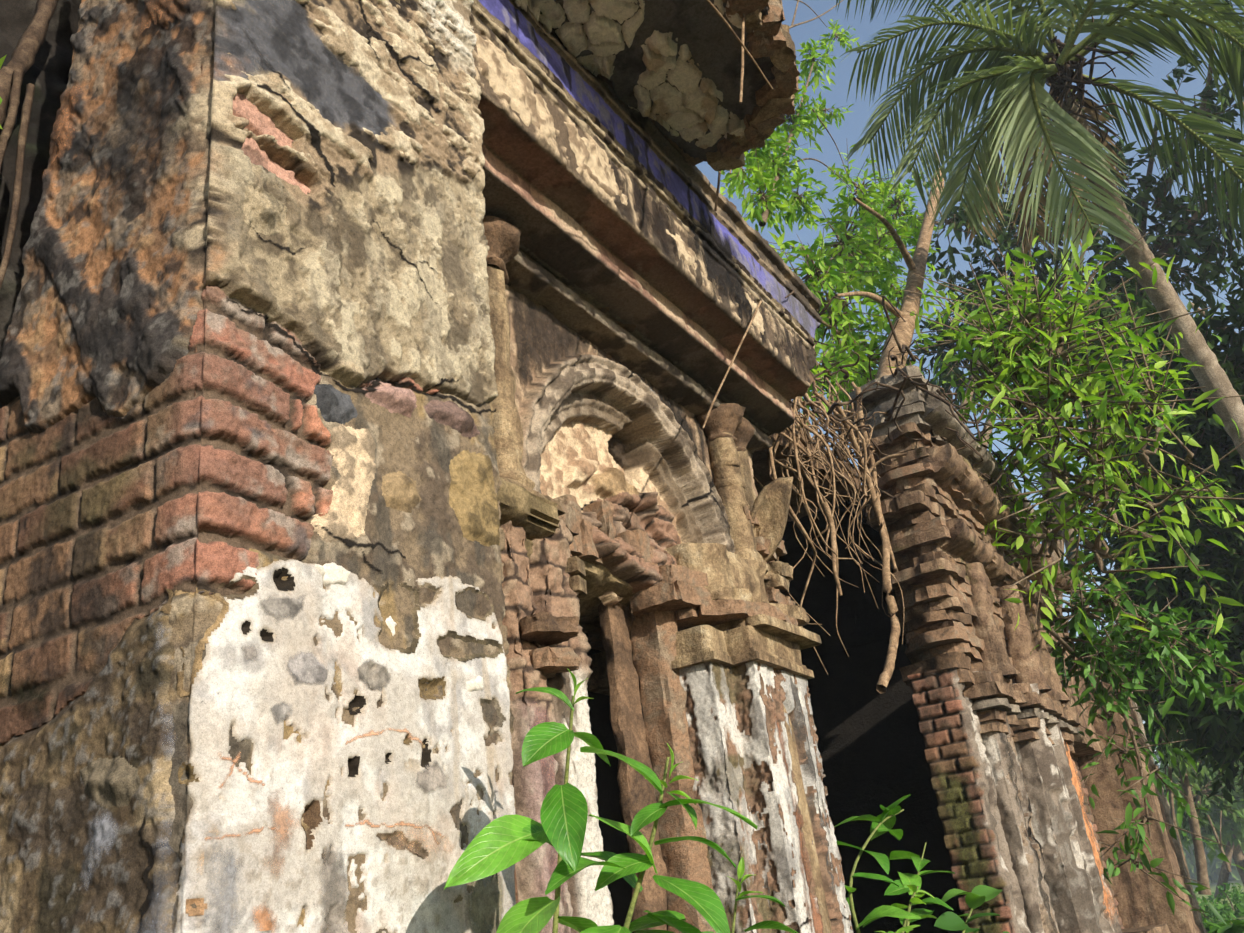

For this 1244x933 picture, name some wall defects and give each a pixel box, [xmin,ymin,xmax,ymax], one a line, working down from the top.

flaking render [219,0,628,205]
flaking render [515,0,746,149]
crack [228,299,496,414]
flaking render [0,285,516,933]
crack [316,525,406,572]
spalling [725,663,853,933]
spalling [1006,733,1043,863]
spalling [1039,899,1059,933]